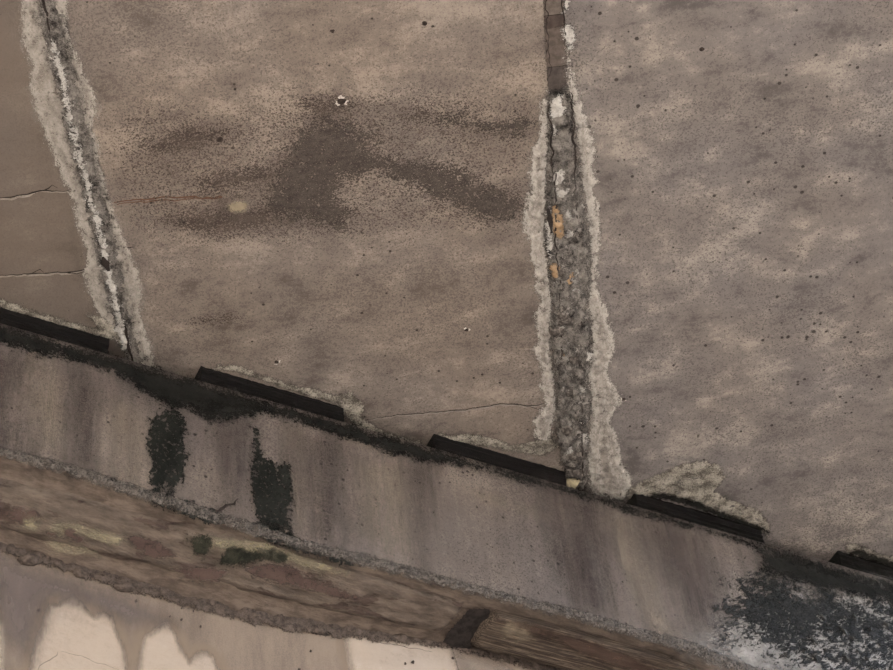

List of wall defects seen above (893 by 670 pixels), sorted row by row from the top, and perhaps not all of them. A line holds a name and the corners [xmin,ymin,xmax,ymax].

crack [0,185,72,201]
crack [0,269,93,278]
water stain [0,0,774,537]
water stain [251,528,354,567]
water stain [845,542,893,562]
water stain [0,549,350,670]